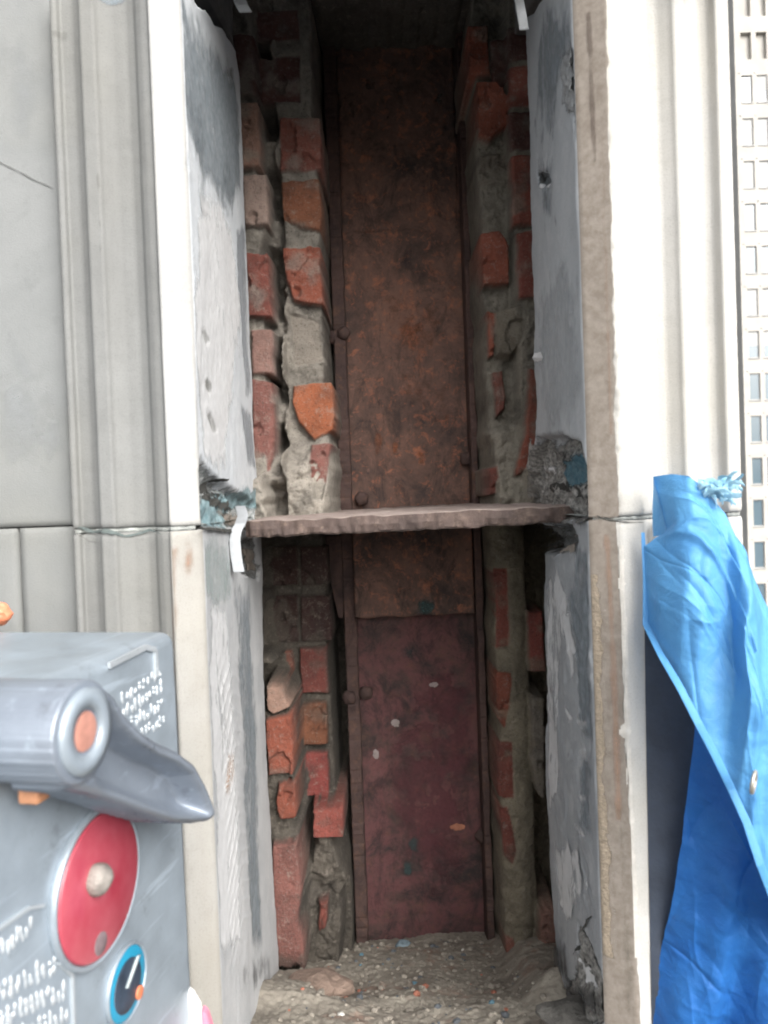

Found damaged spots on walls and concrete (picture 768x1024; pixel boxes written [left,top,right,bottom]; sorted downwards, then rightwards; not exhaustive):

water stain [182,0,240,225]
crack [0,162,53,188]
spalling [198,467,256,529]
spalling [526,438,592,553]
spalling [564,926,604,1024]